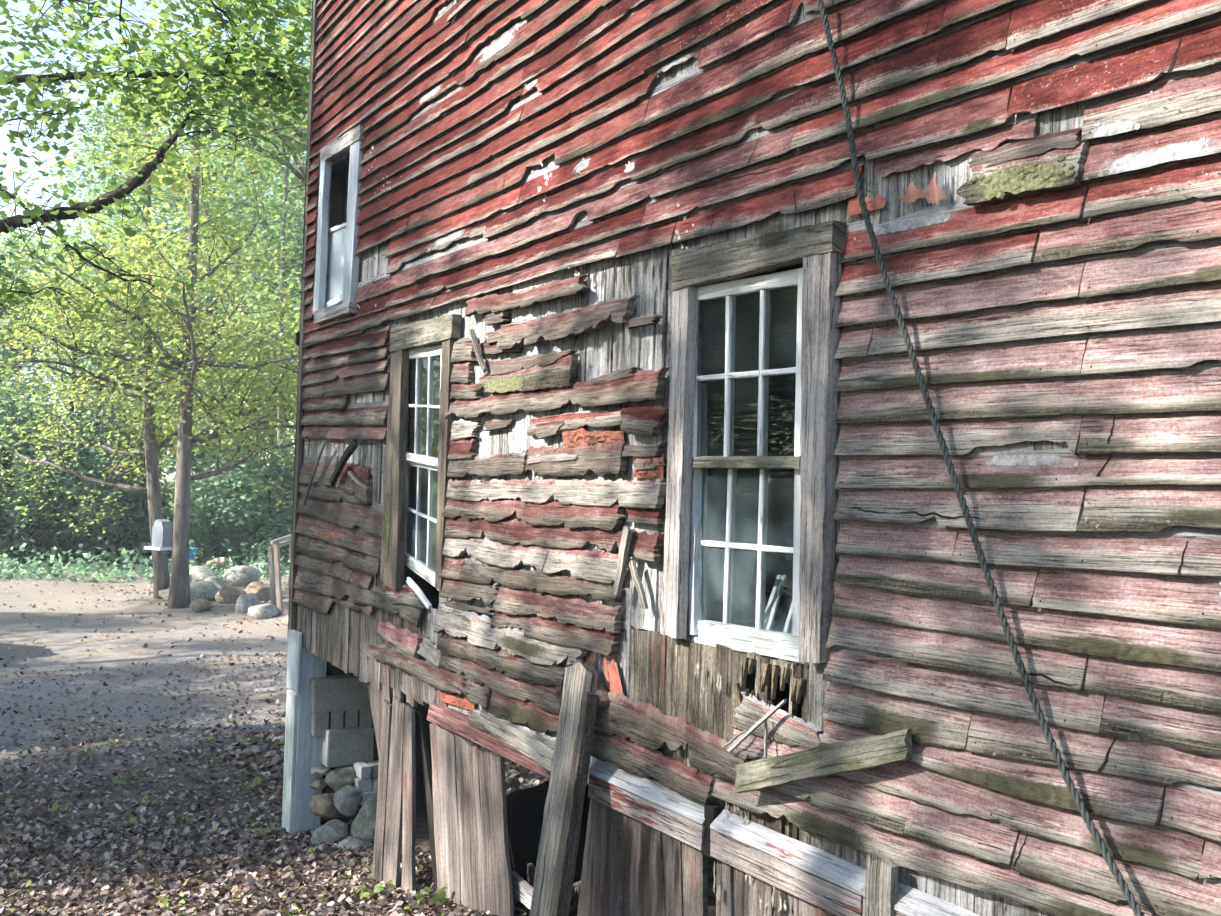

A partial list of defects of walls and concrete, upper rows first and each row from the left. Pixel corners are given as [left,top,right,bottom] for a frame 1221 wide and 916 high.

peeling [481,28,518,61]
peeling [657,54,690,77]
peeling [420,85,440,104]
peeling [1092,120,1140,138]
peeling [573,157,590,173]
peeling [1109,138,1221,198]
peeling [848,173,951,235]
crack [1093,416,1115,477]
crack [847,507,984,520]
crack [1178,541,1204,575]
crack [1064,738,1124,772]
crack [1013,833,1029,867]